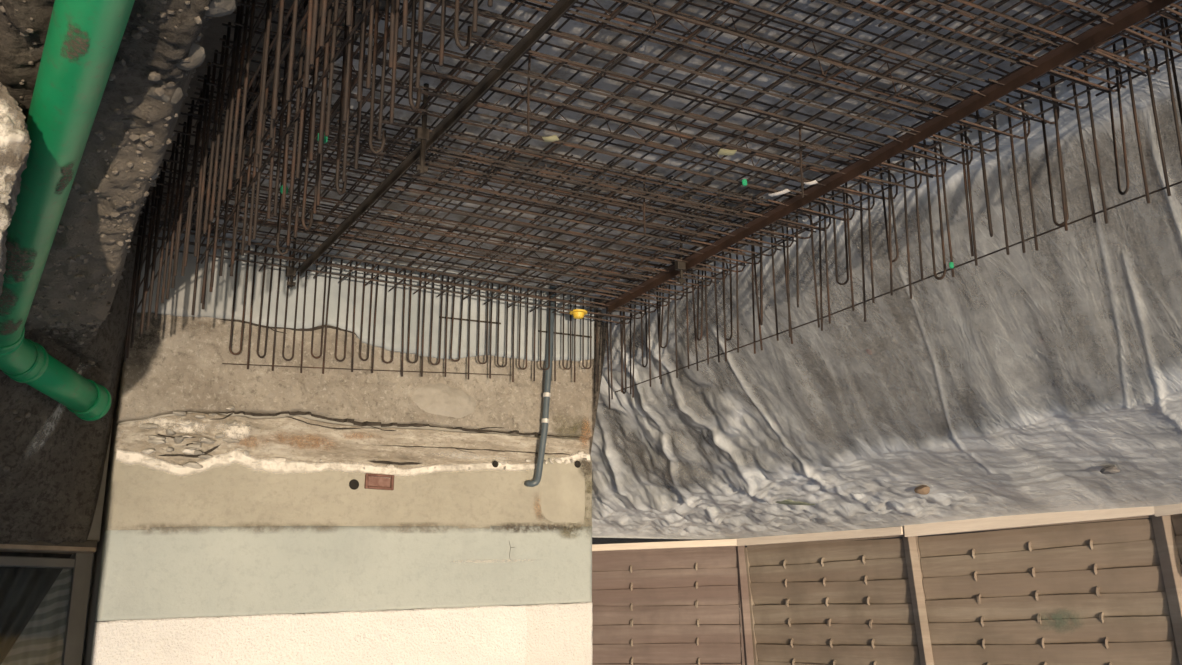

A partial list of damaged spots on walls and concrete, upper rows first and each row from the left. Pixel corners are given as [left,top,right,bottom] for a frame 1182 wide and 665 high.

flaking render [116,405,590,490]
crack [157,411,582,465]